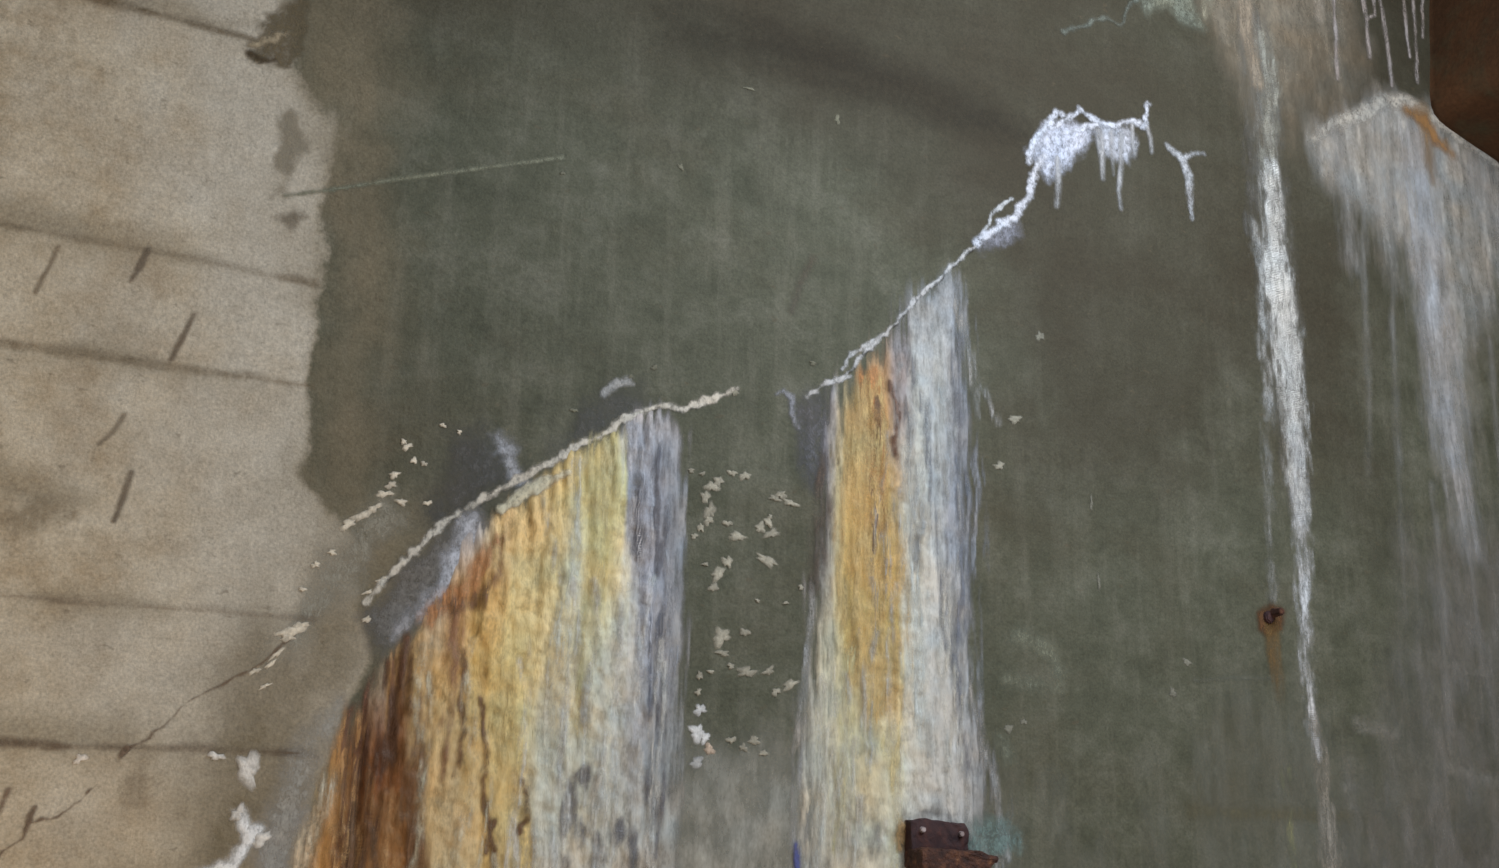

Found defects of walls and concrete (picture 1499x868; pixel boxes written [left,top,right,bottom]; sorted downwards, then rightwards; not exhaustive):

damp [1034,102,1199,215]
damp [983,225,1016,245]
damp [1061,0,1499,538]
peeling [249,439,432,690]
crack [218,641,288,687]
damp [1299,563,1337,868]
crack [119,729,158,758]
crack [21,789,90,840]
rust [896,822,906,851]